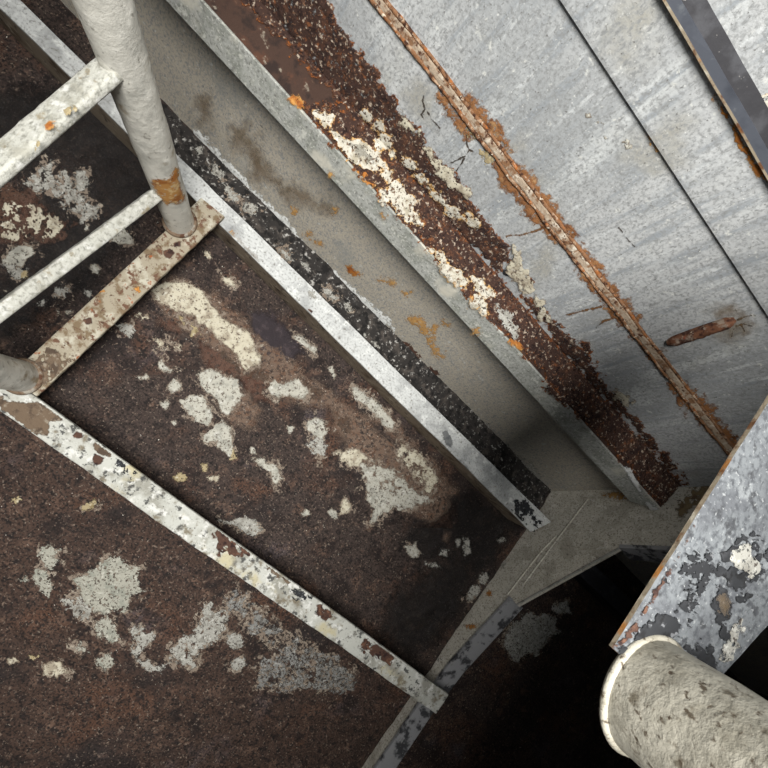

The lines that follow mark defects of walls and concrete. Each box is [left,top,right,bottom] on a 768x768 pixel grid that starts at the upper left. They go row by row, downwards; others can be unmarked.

corrosion [436,92,476,142]
corrosion [152,168,185,204]
peeling [193,129,307,242]
corrosion [462,93,643,340]
peeling [307,263,395,333]
corrosion [156,276,457,521]
peeling [262,365,441,529]
corrosion [666,379,714,439]
corrosion [687,384,739,446]
peeling [212,512,266,557]
peeling [20,542,360,695]
peeling [633,531,768,670]